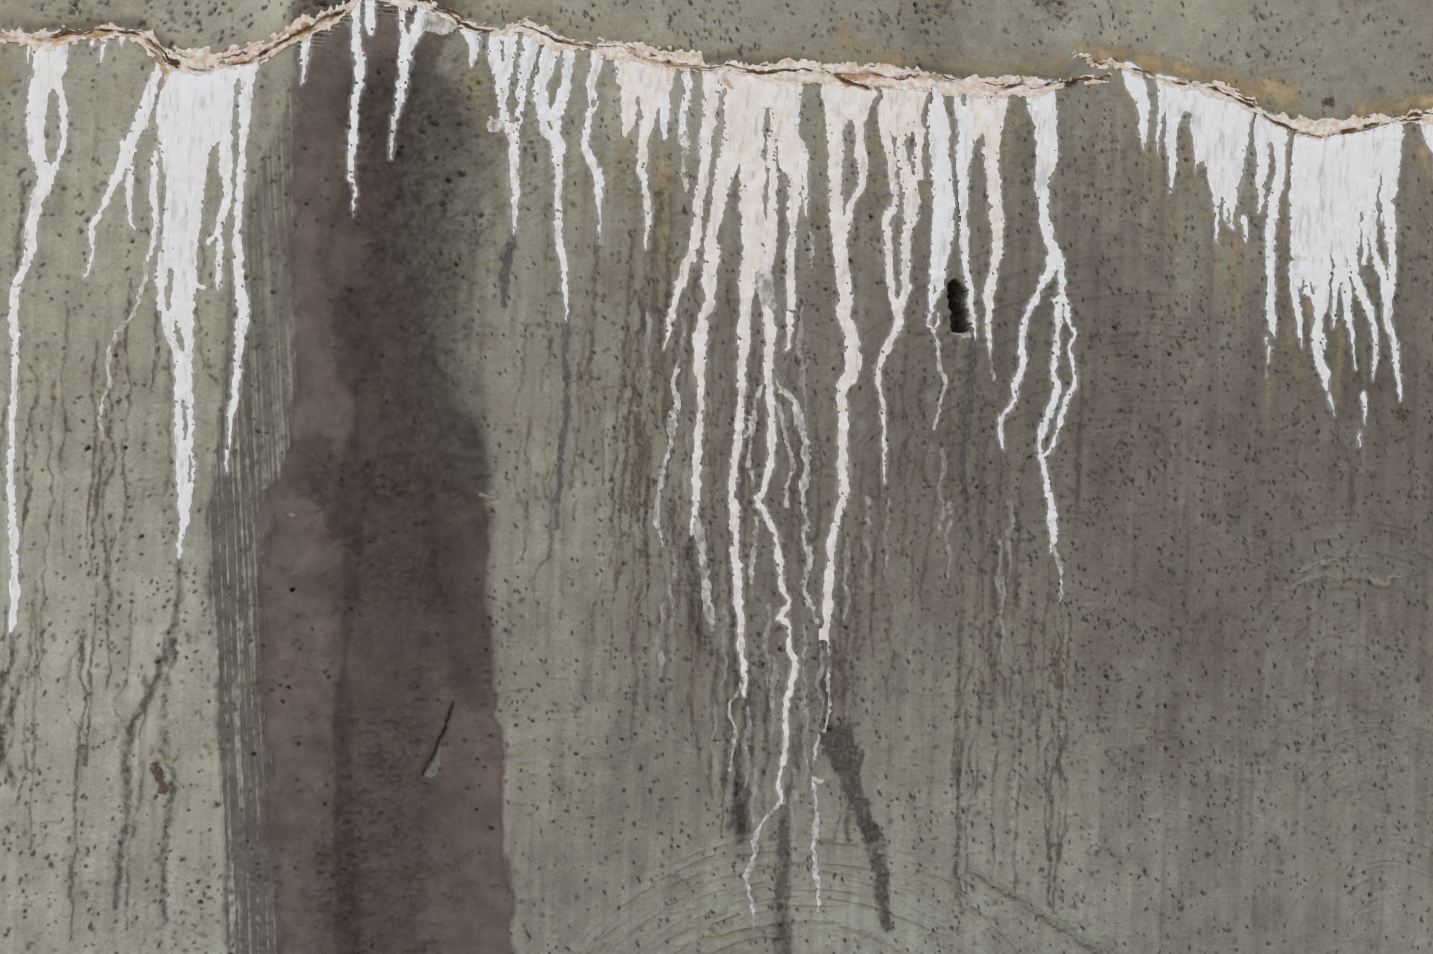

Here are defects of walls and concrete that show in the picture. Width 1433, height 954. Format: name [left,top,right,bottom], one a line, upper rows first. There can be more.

water stain [0,30,69,633]
water stain [83,0,1082,954]
crack [0,0,1433,140]
water stain [1122,61,1433,456]
water stain [0,631,43,791]
water stain [73,587,127,825]